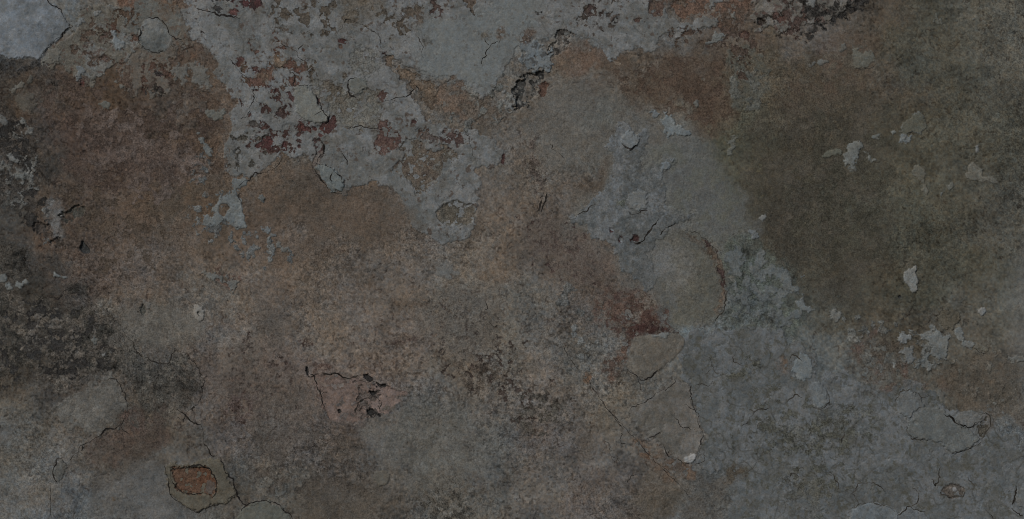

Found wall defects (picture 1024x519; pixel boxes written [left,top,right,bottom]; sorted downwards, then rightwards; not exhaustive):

peeling [71,0,853,271]
crack [632,209,728,321]
peeling [569,109,1024,519]
crack [50,378,128,514]
crack [132,341,293,519]
peeling [164,456,291,519]
spalling [305,366,408,423]
crack [562,344,742,498]
crack [743,391,830,433]
crack [829,412,991,516]